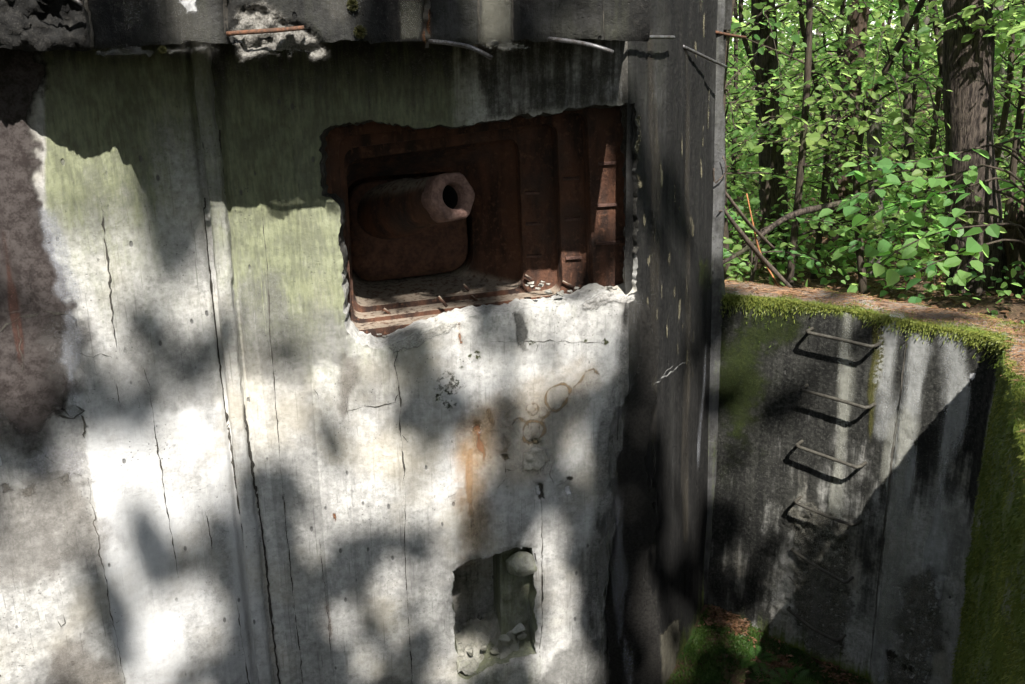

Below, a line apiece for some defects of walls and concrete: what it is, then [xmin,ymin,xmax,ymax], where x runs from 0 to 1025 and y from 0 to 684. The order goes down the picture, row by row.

spalling [234,2,326,59]
damp [0,47,89,550]
crack [79,198,117,370]
crack [53,401,91,437]
crack [116,370,178,574]
crack [203,130,303,684]
corrosion [459,409,494,525]
damp [828,314,852,554]
damp [876,316,927,642]
damp [911,337,975,684]
damp [50,642,119,684]